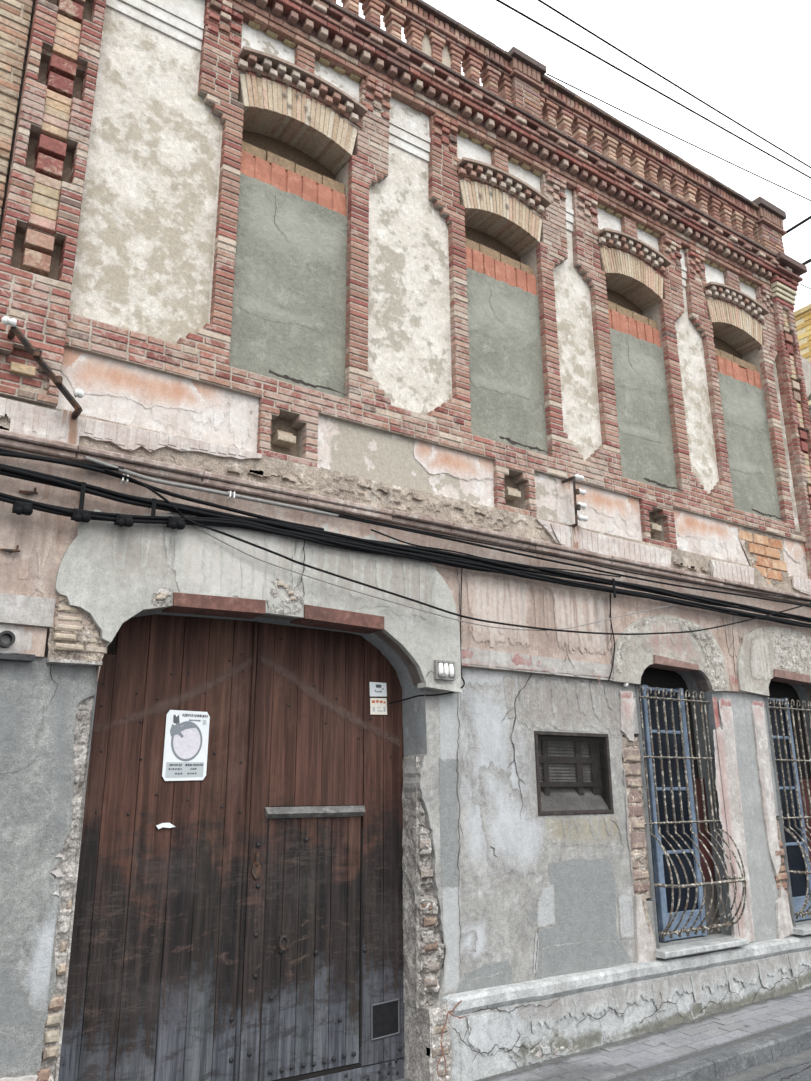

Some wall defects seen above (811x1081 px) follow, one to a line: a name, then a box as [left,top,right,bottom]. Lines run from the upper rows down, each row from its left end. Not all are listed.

peeling [89,416,558,544]
spalling [738,528,789,588]
peeling [0,624,32,653]
spalling [46,595,108,669]
spalling [616,617,728,690]
crack [501,673,532,820]
spalling [36,695,94,1081]
spalling [402,756,453,1081]
crack [456,711,464,971]
spalling [621,736,652,934]
crack [437,996,564,1077]
crack [577,968,806,1025]